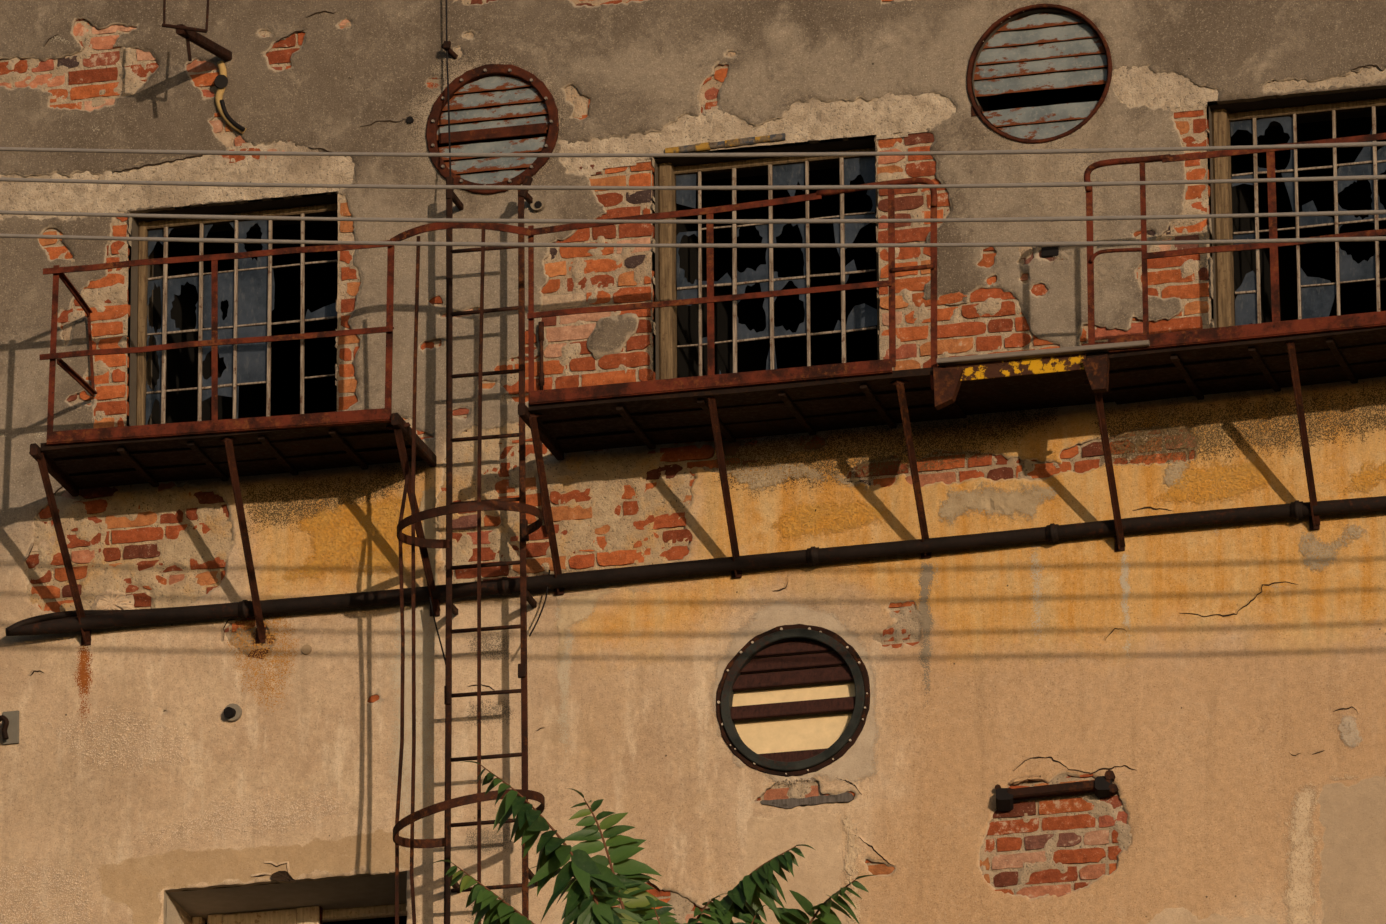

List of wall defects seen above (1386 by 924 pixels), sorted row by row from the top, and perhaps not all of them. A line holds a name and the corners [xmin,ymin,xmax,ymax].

flaking render [0,19,159,111]
flaking render [0,59,361,429]
flaking render [482,51,1068,403]
flaking render [282,408,1270,585]
flaking render [26,482,234,612]
rust [73,645,93,722]
rust [227,614,300,712]
flaking render [873,601,921,648]
crack [1179,579,1299,617]
flaking render [757,778,830,807]
flaking render [980,773,1132,899]
flaking render [645,881,711,924]